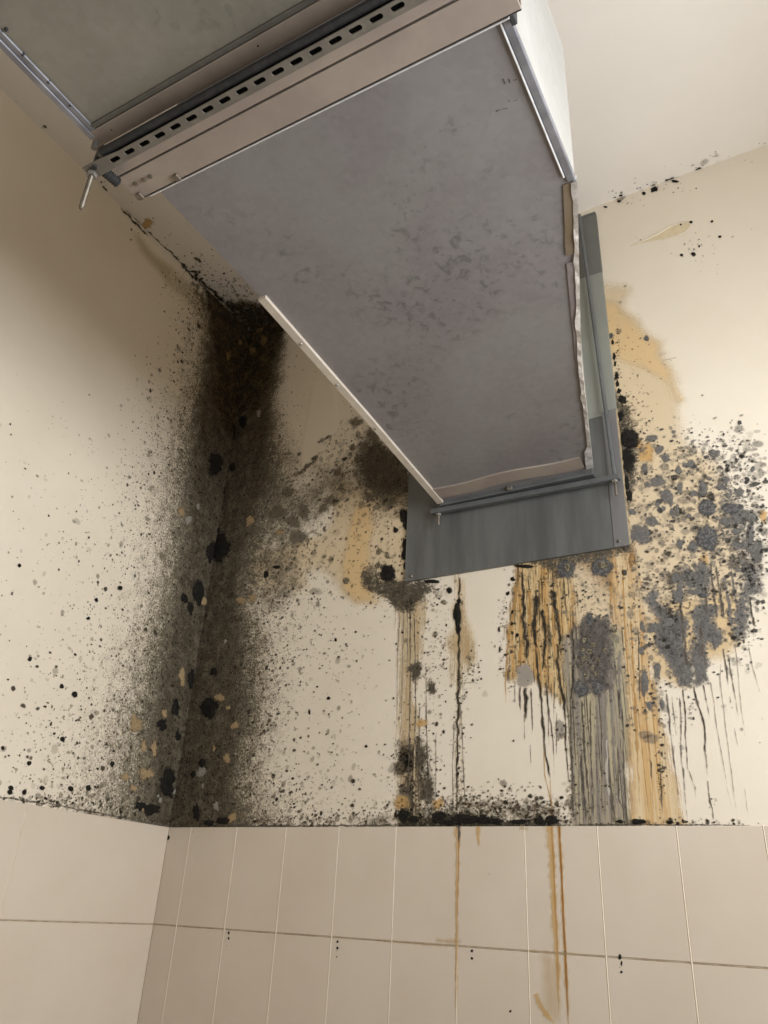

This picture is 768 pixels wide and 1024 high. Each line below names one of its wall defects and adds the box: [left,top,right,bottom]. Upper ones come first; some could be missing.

damp [1,201,768,827]
rust [547,826,568,1013]